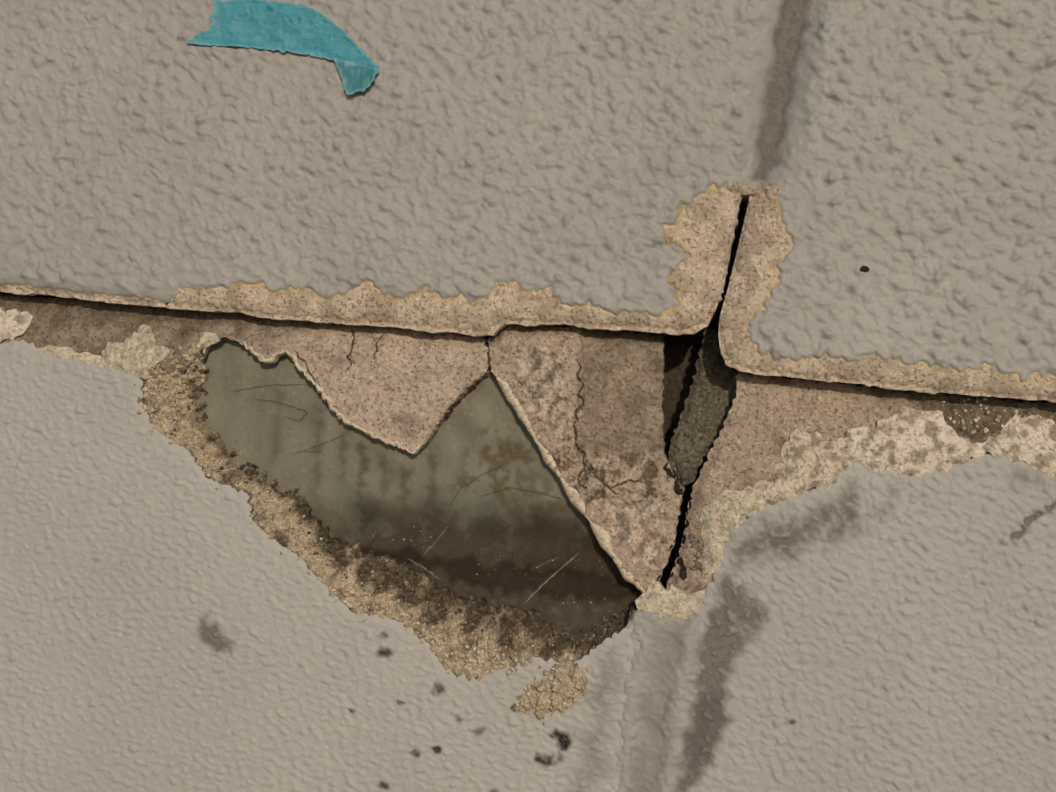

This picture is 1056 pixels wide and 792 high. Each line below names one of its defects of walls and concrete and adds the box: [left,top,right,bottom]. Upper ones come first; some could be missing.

spalling [0,179,1056,725]
water stain [739,495,856,553]
water stain [679,578,766,792]